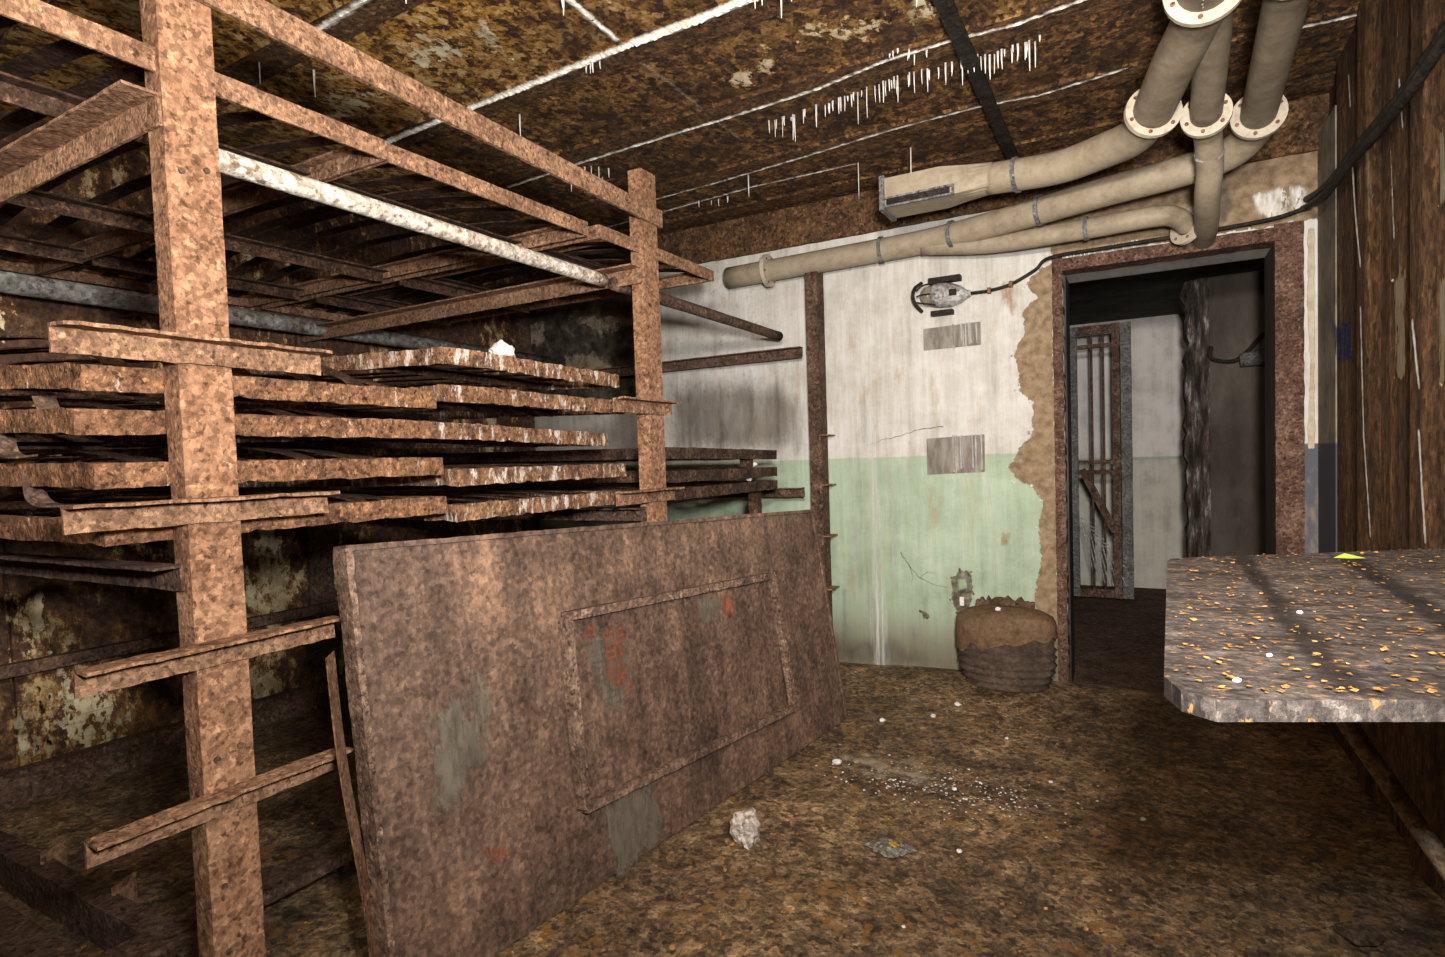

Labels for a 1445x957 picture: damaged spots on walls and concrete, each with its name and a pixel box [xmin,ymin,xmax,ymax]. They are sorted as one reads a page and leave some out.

water stain [316,0,369,30]
water stain [386,119,443,144]
water stain [467,0,763,110]
water stain [575,0,1122,213]
peeling [1047,184,1195,225]
peeling [1217,151,1318,449]
peeling [1391,269,1407,382]
peeling [1006,226,1172,653]